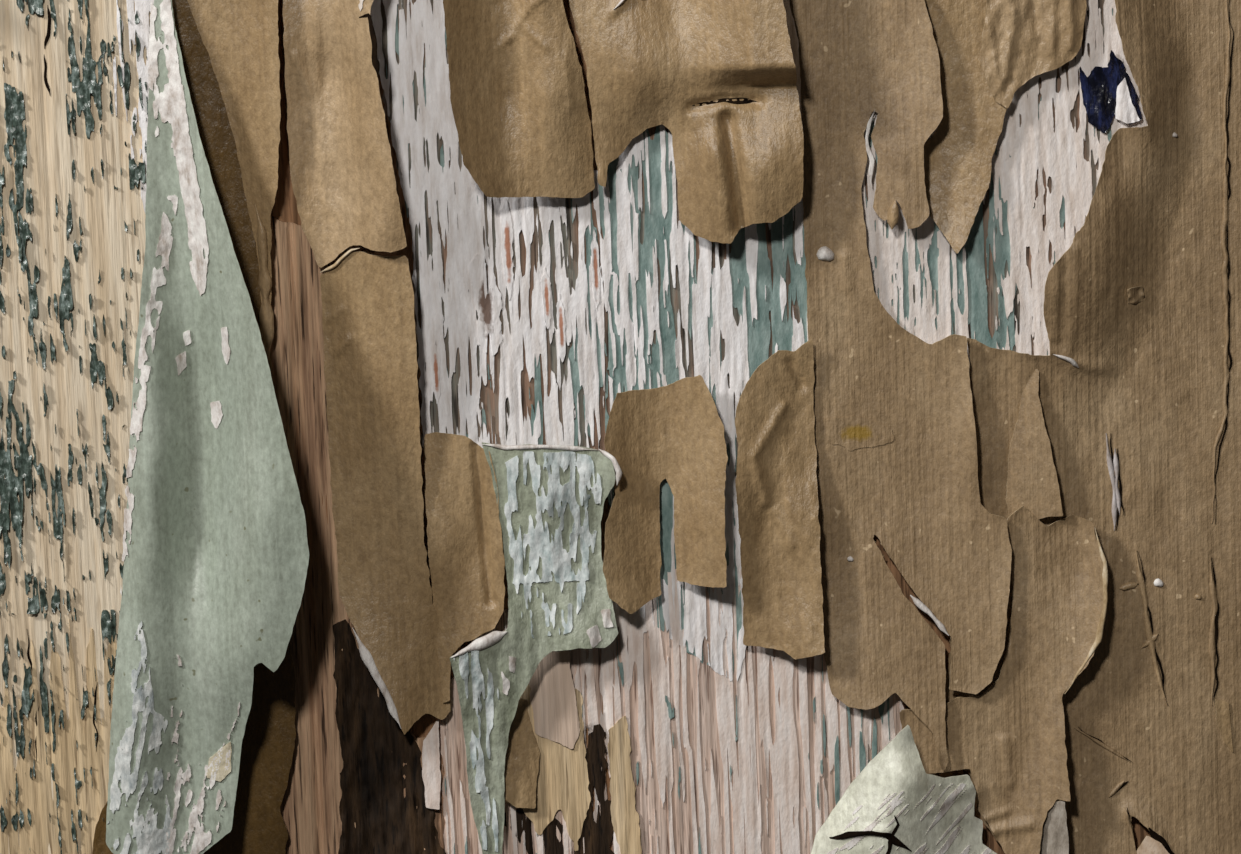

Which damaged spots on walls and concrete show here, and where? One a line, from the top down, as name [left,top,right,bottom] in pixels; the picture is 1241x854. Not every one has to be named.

peeling [0,0,296,854]
peeling [283,0,1241,854]
crack [1209,557,1219,704]
crack [1211,0,1234,524]